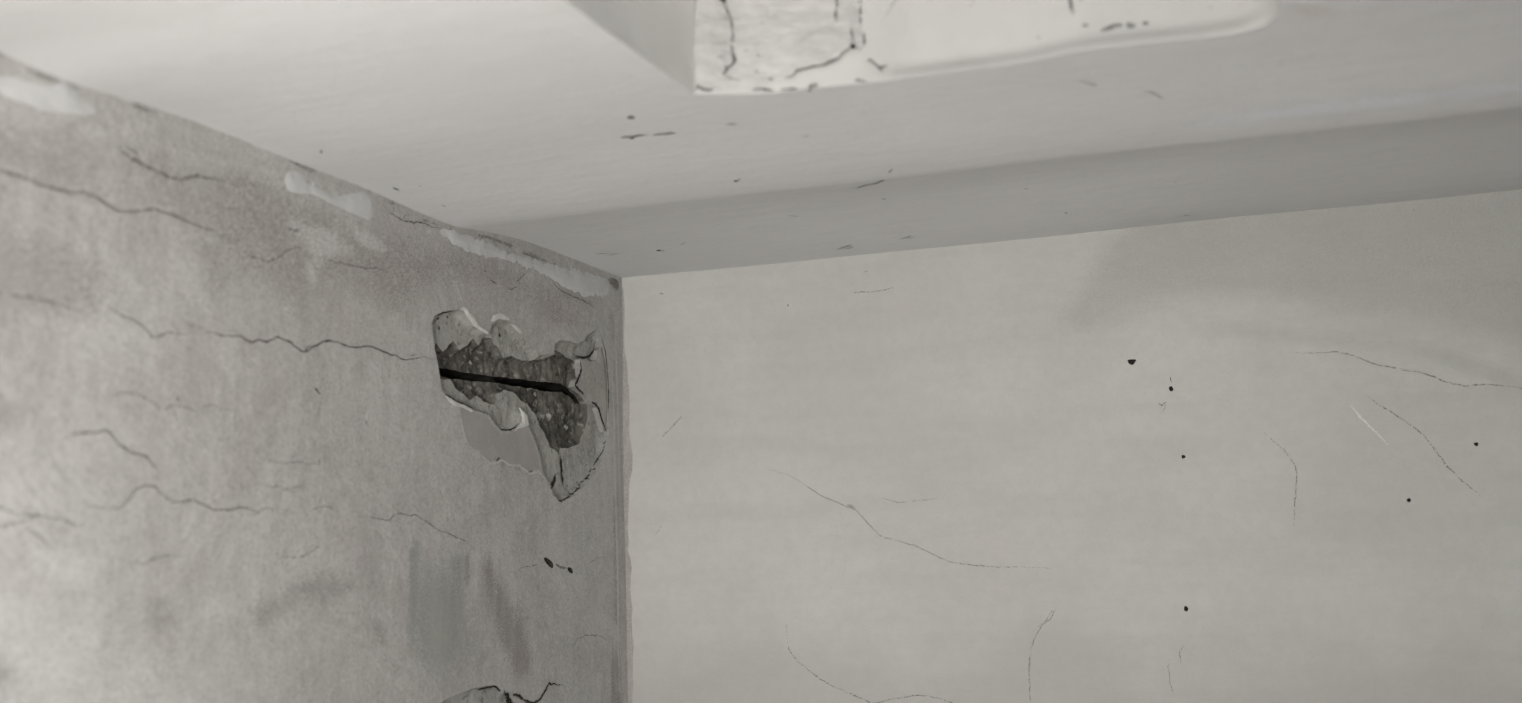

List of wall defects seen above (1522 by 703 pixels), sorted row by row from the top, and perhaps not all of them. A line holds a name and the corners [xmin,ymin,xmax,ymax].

crack [0,146,384,271]
crack [0,292,430,360]
spalling [431,307,609,503]
crack [0,392,475,551]
spalling [441,682,560,703]